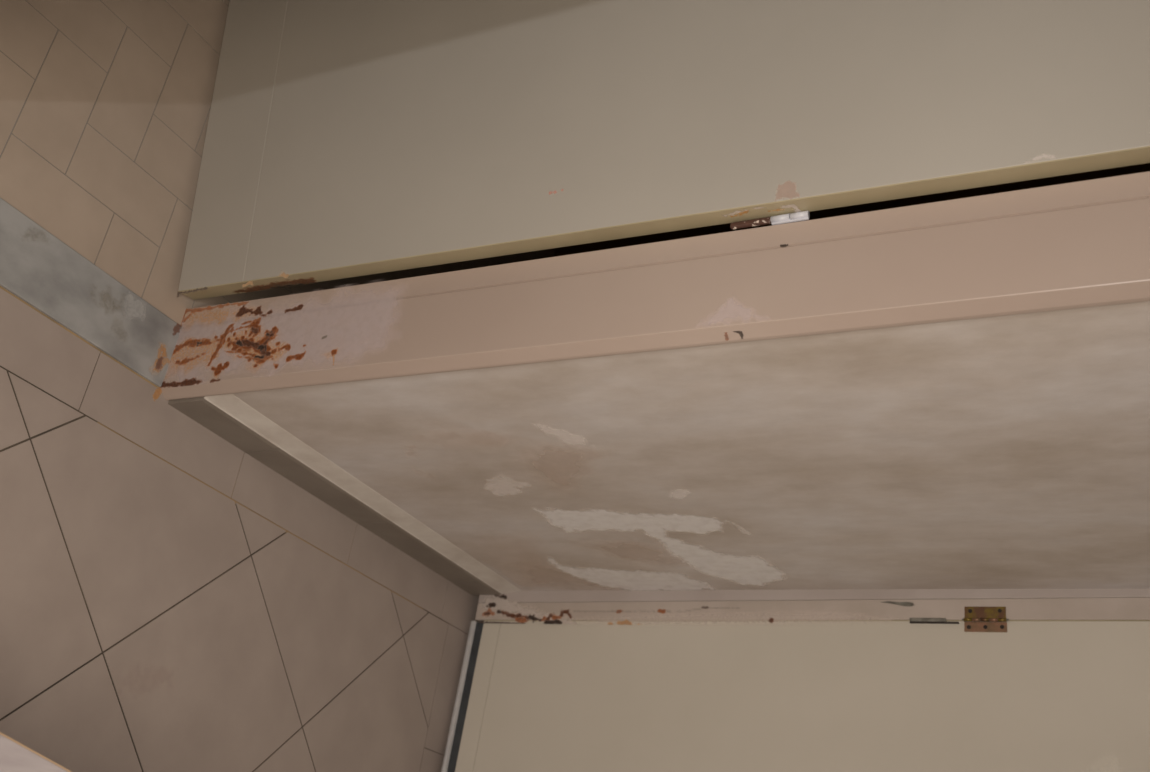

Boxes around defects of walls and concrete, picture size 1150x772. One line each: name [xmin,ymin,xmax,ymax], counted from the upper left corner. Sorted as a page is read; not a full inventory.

corrosion [153,273,317,401]
flaking render [535,509,783,591]
corrosion [480,594,576,624]